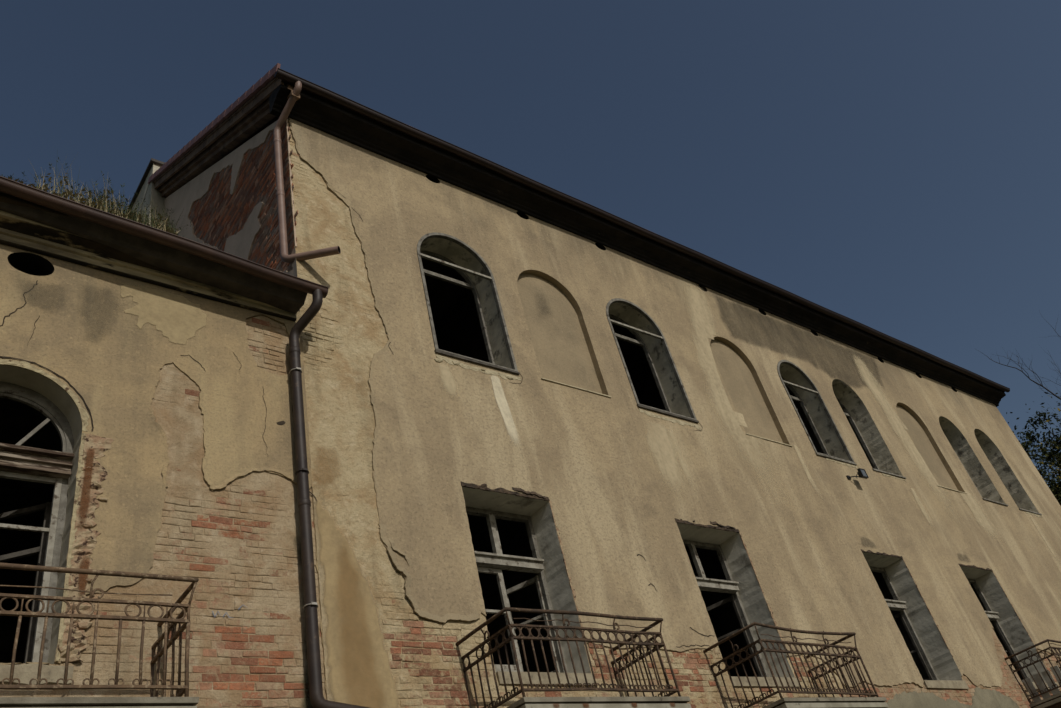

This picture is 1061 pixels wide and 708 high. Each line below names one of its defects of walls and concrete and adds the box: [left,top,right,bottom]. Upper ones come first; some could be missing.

crack [0,280,40,346]
flaking render [121,284,207,344]
crack [288,120,394,355]
flaking render [189,118,1061,708]
flaking render [0,356,308,708]